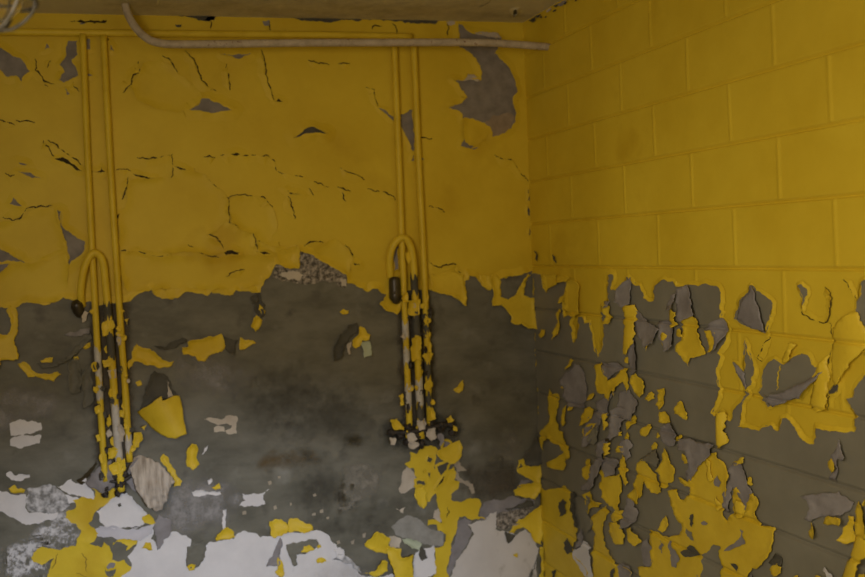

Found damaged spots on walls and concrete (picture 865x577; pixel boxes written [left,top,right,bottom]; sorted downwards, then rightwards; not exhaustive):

peeling [0,36,98,100]
peeling [175,16,216,28]
peeling [295,18,522,165]
crack [0,119,365,292]
peeling [0,202,865,577]